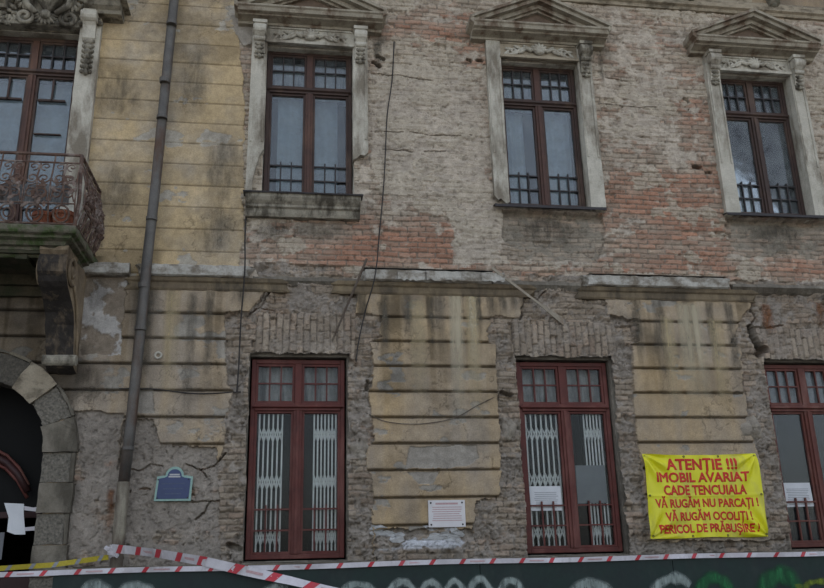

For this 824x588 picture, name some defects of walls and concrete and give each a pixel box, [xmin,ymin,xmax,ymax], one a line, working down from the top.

flaking render [378,0,486,69]
flaking render [80,277,129,356]
water stain [470,296,515,332]
crack [749,306,784,329]
flaking render [123,195,824,566]
flaking render [65,409,126,568]
crack [129,463,165,493]
crack [186,452,227,477]
crack [190,499,220,520]